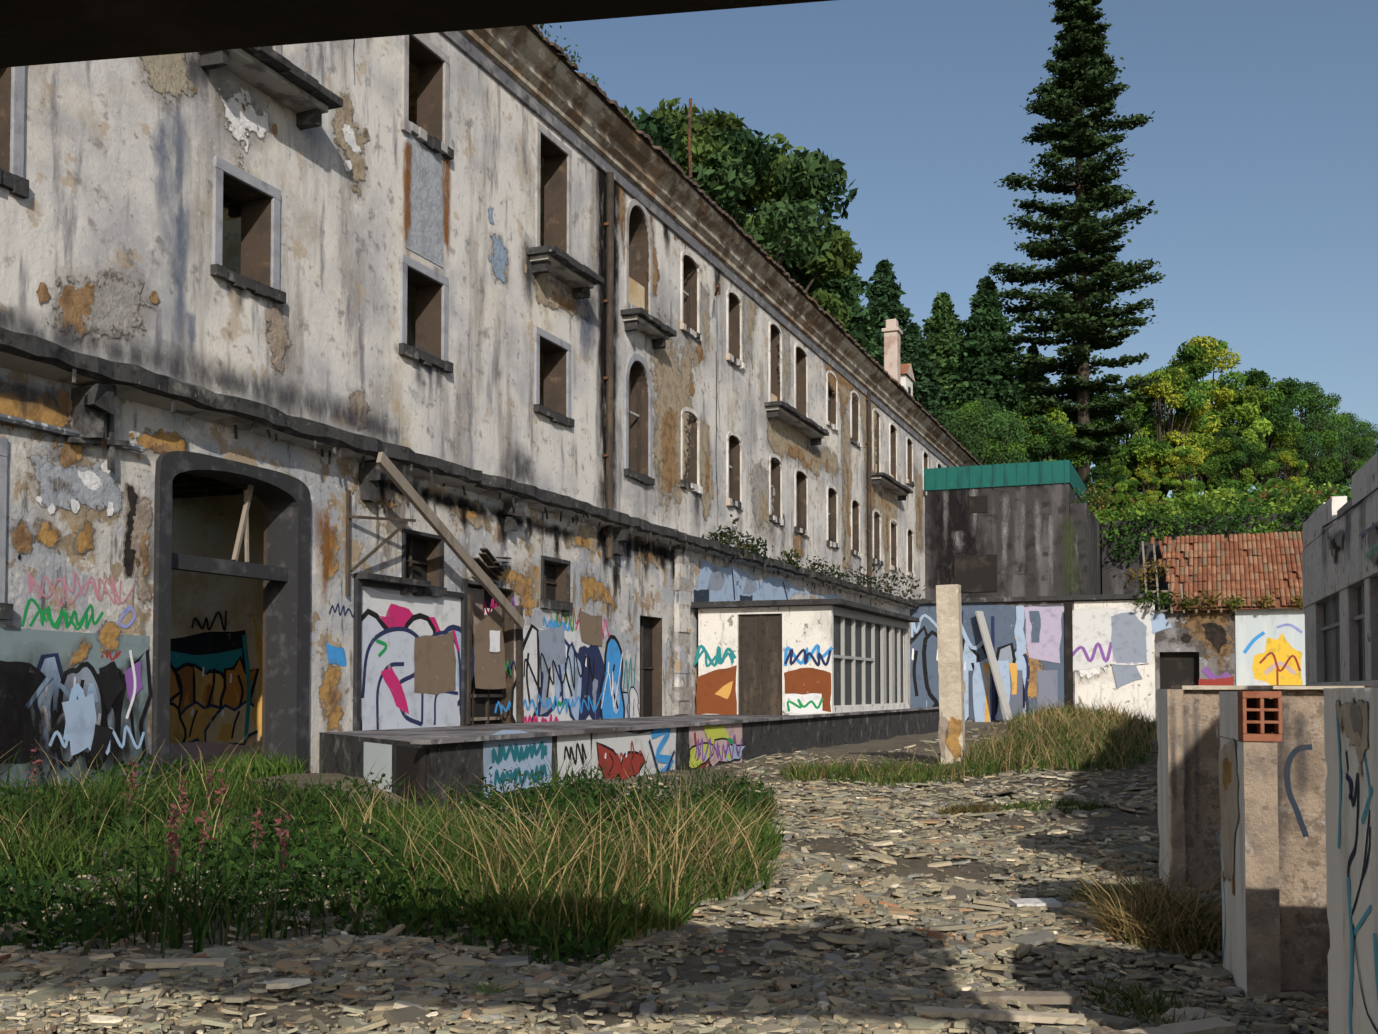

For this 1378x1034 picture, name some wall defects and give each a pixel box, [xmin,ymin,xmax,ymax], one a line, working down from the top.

spalling [140,53,197,105]
leakage [156,123,183,199]
peeling [215,86,278,171]
peeling [332,91,370,196]
spalling [36,268,161,342]
leakage [173,215,194,341]
spalling [488,206,593,324]
leakage [0,310,393,437]
peeling [0,381,153,604]
peeling [1336,698,1368,778]